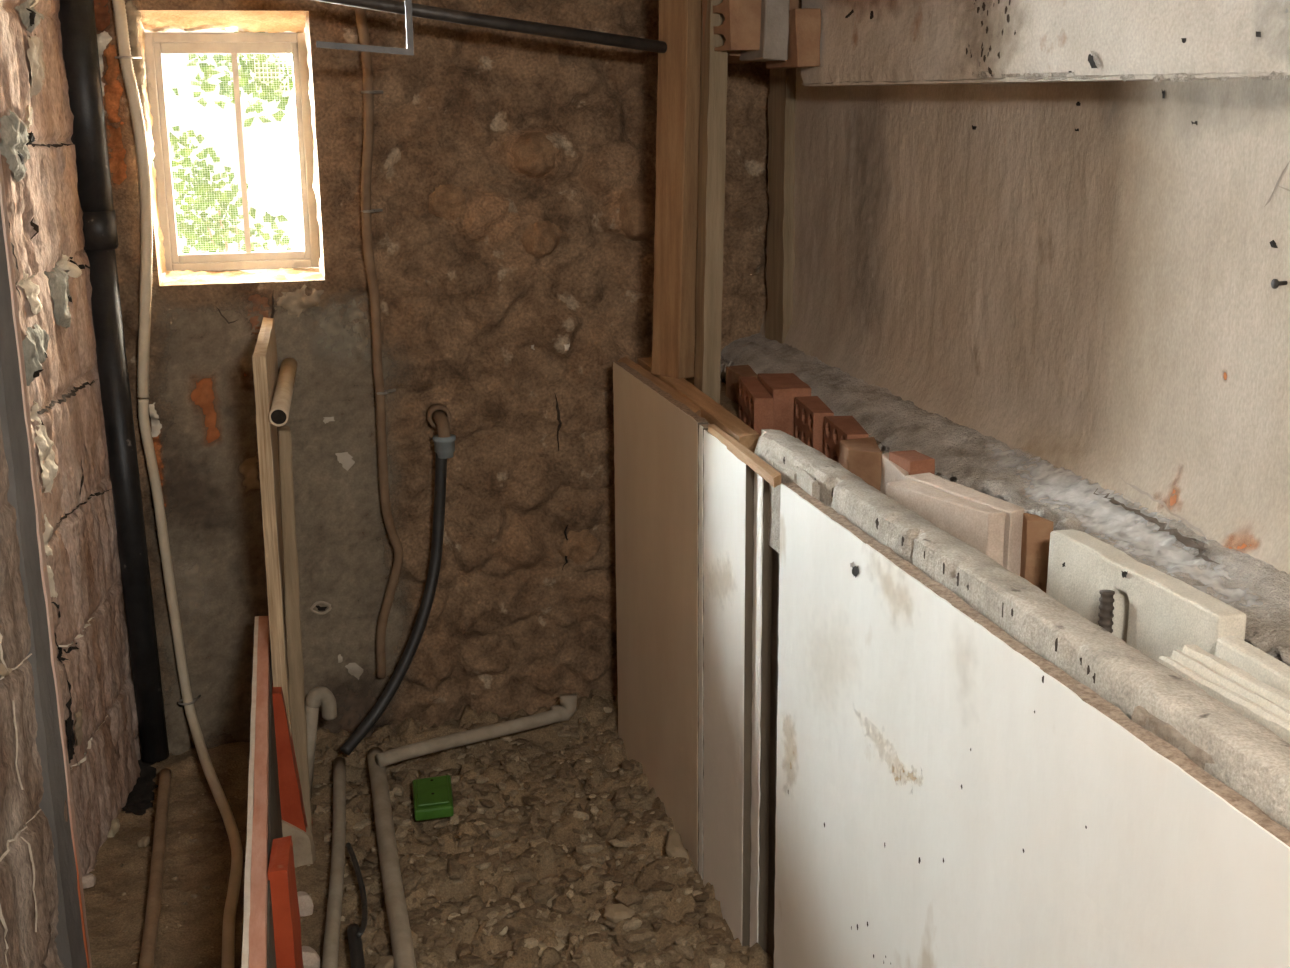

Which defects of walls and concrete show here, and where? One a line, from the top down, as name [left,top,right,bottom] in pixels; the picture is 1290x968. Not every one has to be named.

flaking render [190,376,221,445]
crack [56,460,110,524]
crack [0,602,108,968]